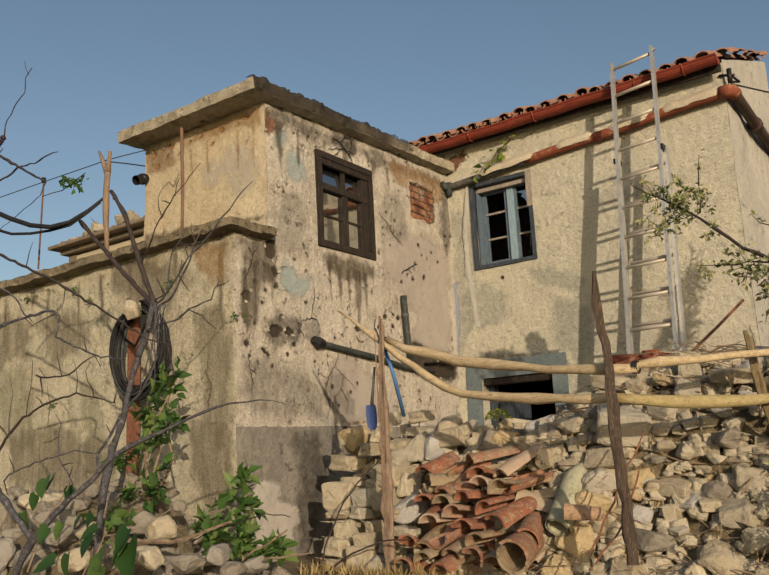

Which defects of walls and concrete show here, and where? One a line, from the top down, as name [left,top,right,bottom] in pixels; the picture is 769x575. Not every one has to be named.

flaking render [409,179,438,227]
damp [114,254,178,304]
damp [327,254,373,330]
spalling [268,315,296,356]
damp [191,286,230,508]